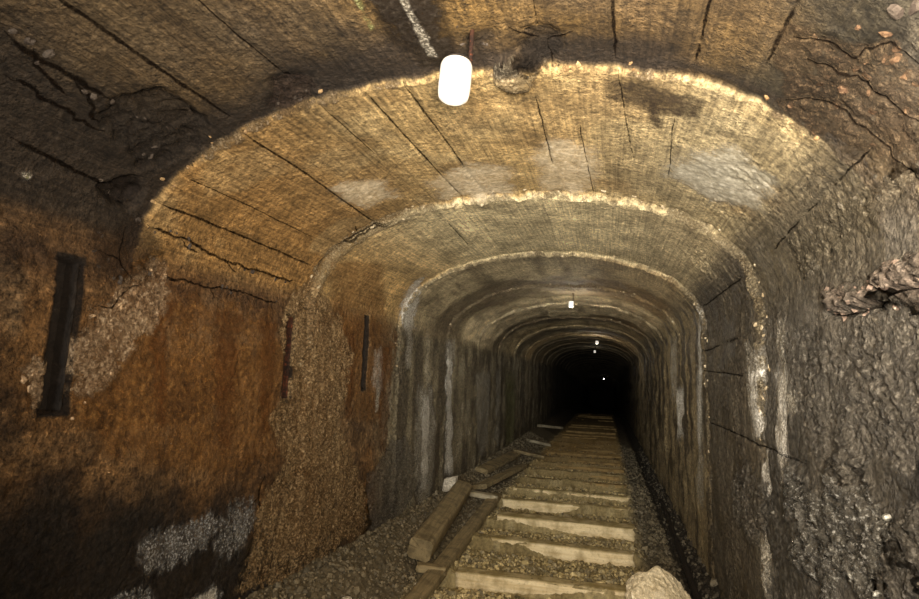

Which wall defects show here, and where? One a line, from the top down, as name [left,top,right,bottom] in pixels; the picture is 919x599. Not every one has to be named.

spalling [887,0,919,20]
spalling [486,25,581,86]
spalling [628,62,655,81]
spalling [201,72,347,160]
crack [148,203,308,303]
peeling [65,257,170,404]
spalling [784,251,919,482]
water stain [138,500,254,572]
water stain [196,586,222,599]